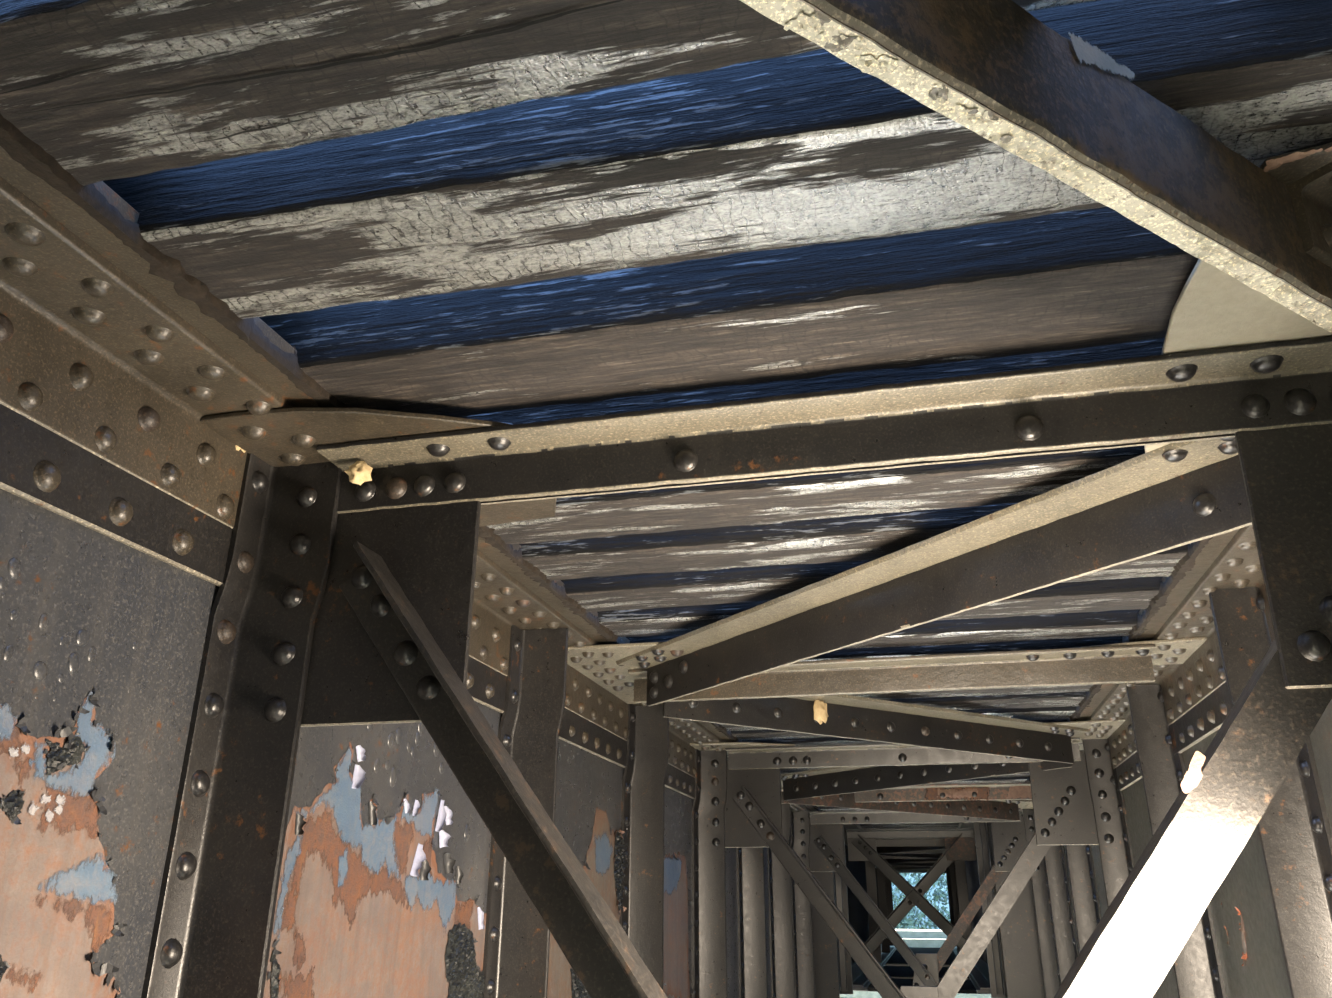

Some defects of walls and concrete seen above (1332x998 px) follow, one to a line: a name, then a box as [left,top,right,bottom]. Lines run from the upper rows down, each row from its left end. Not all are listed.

peeling [0,690,128,998]
peeling [263,742,486,998]